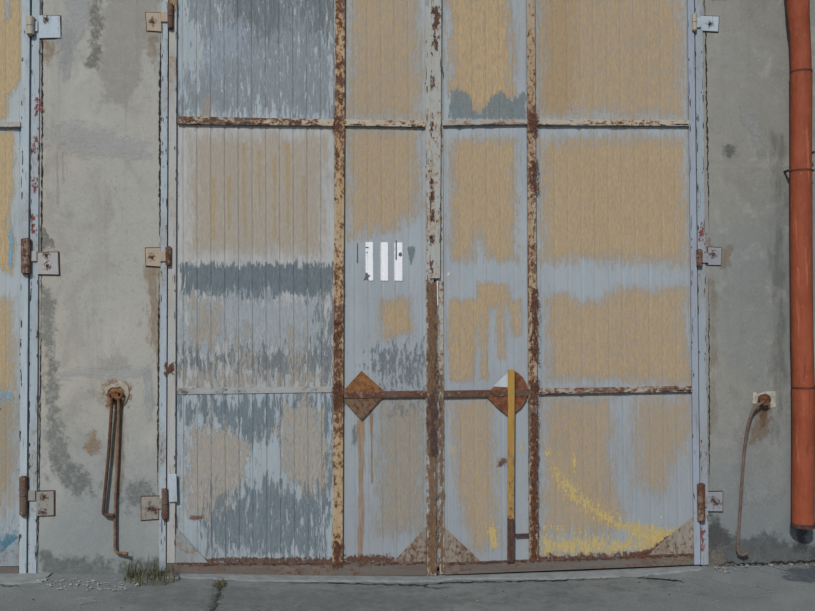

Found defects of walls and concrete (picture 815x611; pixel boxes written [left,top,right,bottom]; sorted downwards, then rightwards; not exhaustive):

water stain [85,4,103,67]
peeling [162,0,335,130]
corrosion [431,4,442,56]
corrosion [527,110,540,135]
corrosion [529,160,540,194]
water stain [44,359,87,493]
peeling [145,259,334,563]
peeling [363,335,429,420]
corrosion [177,260,694,575]
peeling [538,447,682,559]
water stain [708,514,815,582]
crack [209,588,221,611]